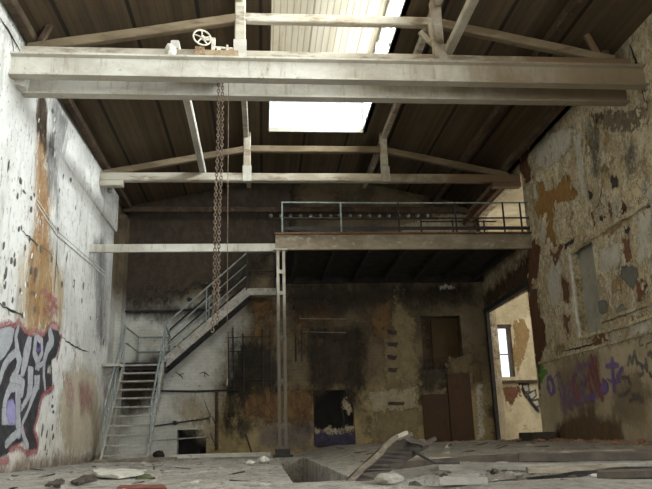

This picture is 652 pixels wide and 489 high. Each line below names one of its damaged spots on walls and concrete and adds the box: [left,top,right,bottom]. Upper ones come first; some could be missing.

flaking render [590,100,649,146]
corrosion [27,98,52,333]
spalling [600,157,618,189]
flaking render [584,179,652,267]
flaking render [513,148,593,400]
flaking render [503,385,522,406]